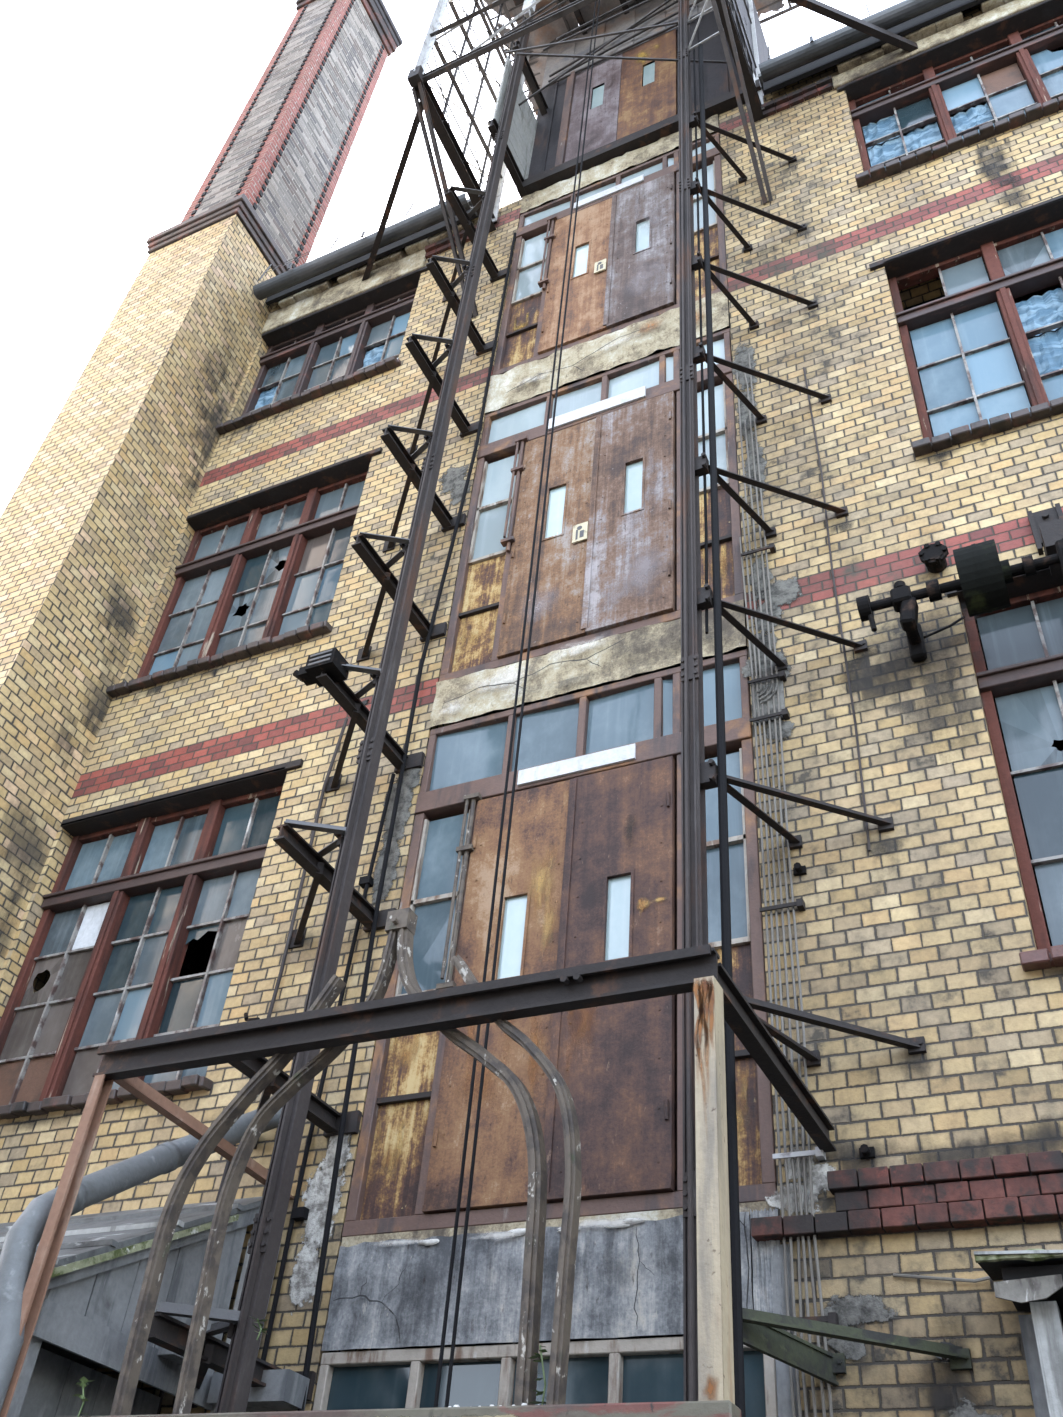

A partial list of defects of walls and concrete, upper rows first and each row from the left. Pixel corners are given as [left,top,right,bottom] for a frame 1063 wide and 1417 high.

water stain [108,586,134,628]
water stain [483,672,518,687]
corrosion [693,979,714,1090]
peeling [324,1134,353,1179]
peeling [289,1237,321,1315]
peeling [827,1338,866,1361]